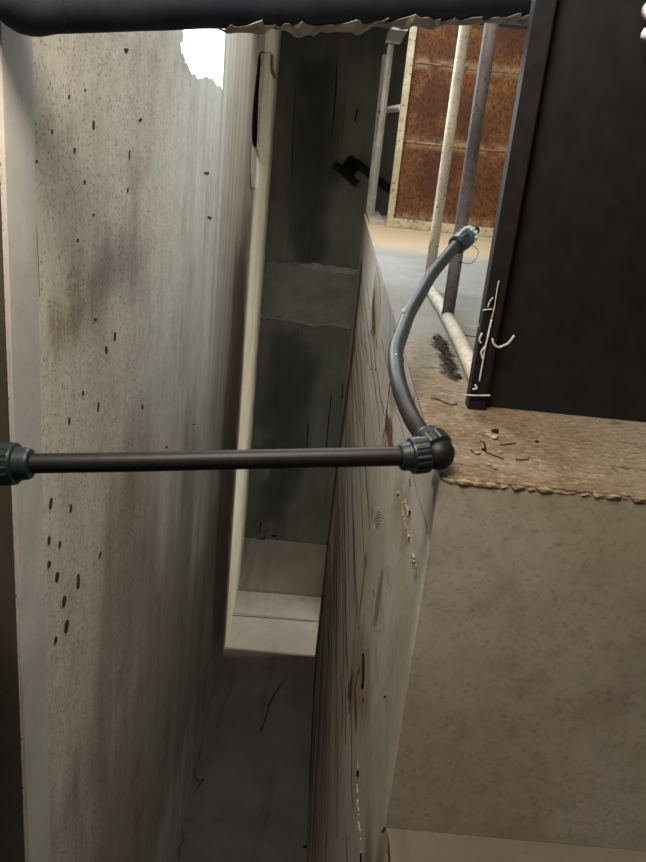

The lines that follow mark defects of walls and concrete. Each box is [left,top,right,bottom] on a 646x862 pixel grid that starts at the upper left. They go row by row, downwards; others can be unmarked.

corrosion [385,411,394,447]